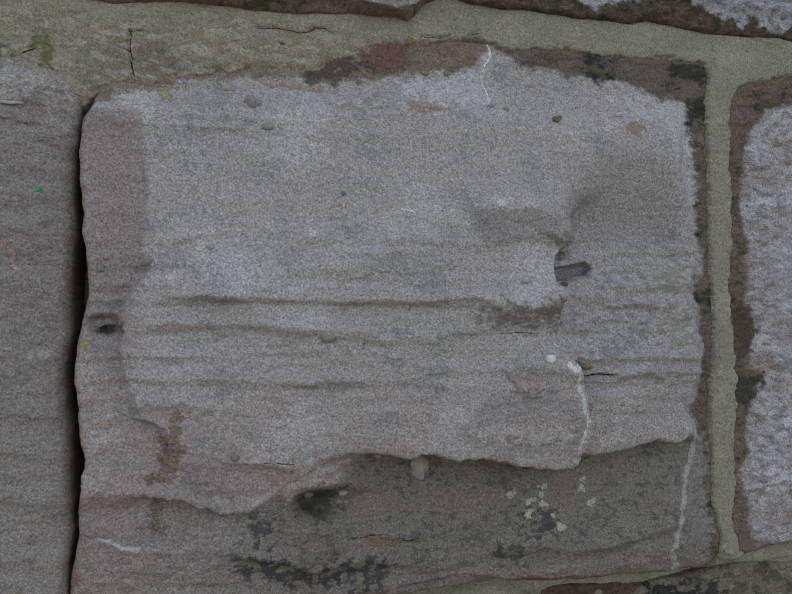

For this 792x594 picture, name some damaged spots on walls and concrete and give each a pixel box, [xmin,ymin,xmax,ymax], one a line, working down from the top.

spalling [297,482,345,521]